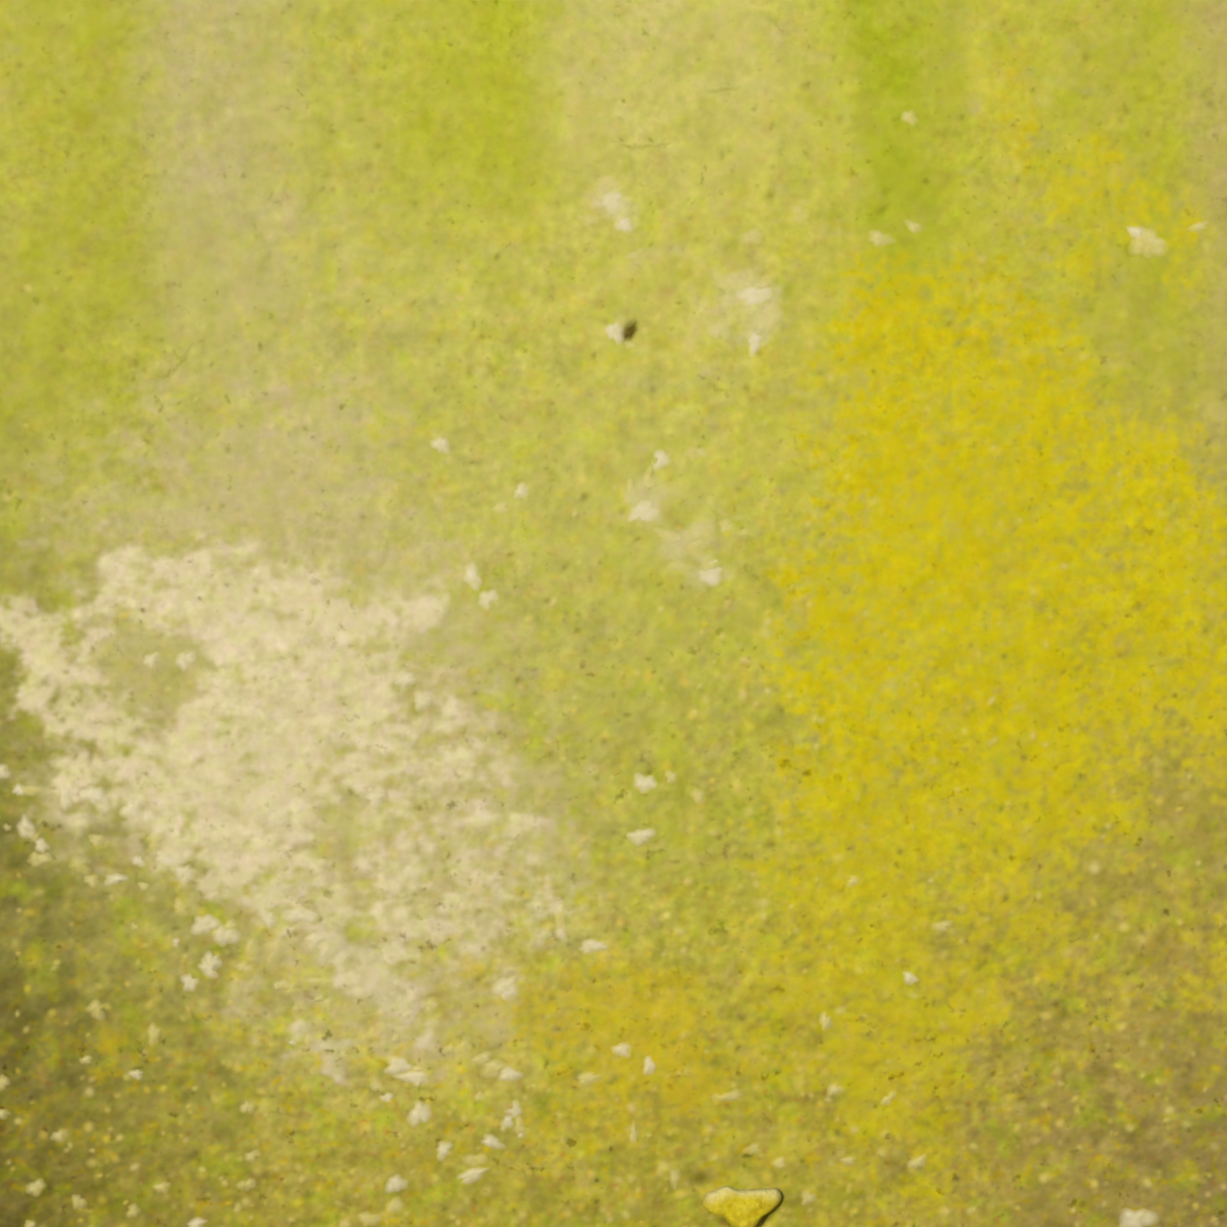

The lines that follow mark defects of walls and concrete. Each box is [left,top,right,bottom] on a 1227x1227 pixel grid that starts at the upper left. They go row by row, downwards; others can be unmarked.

leakage [0,0,638,1128]
leakage [435,1100,527,1185]
leakage [187,1217,208,1227]
leakage [235,1178,257,1192]
leakage [356,1173,409,1227]